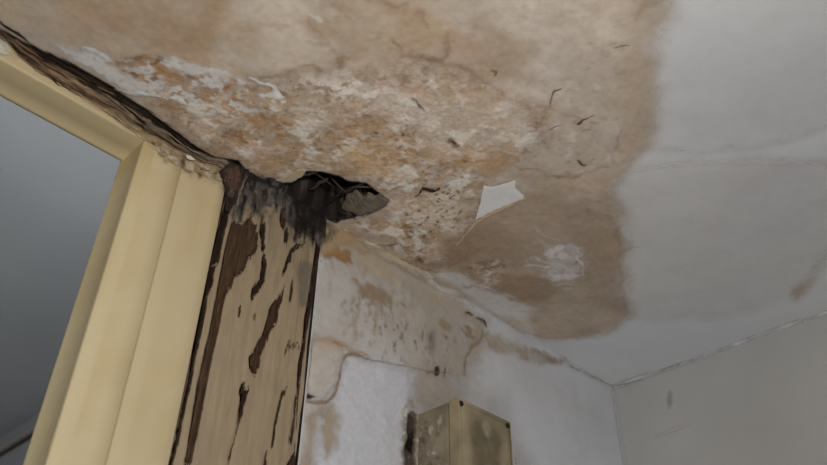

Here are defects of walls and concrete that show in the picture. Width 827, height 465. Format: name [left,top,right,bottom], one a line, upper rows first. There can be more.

spalling [58,46,546,290]
water stain [0,0,669,401]